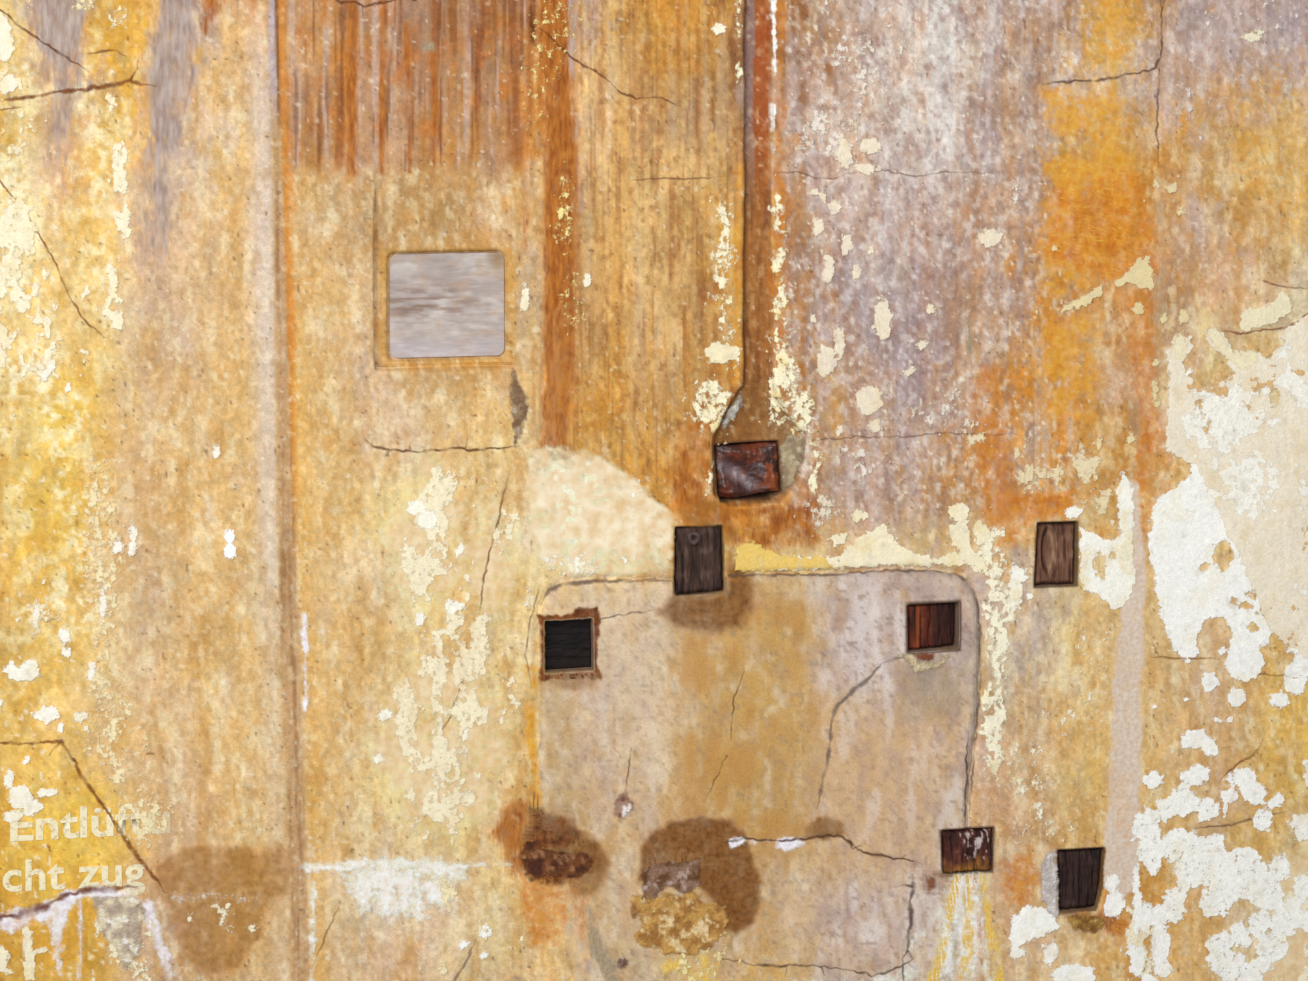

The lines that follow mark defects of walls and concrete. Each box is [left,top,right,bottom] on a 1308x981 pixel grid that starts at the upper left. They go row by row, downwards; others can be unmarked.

crack [0,9,142,110]
peeling [0,195,89,392]
rust [527,0,578,461]
rust [1036,83,1163,298]
rust [974,366,1075,543]
damp [301,613,310,711]
peeling [377,464,521,852]
peeling [733,188,1308,981]
crack [0,740,160,919]
damp [0,844,486,979]
damp [638,816,761,934]
crack [745,834,914,976]